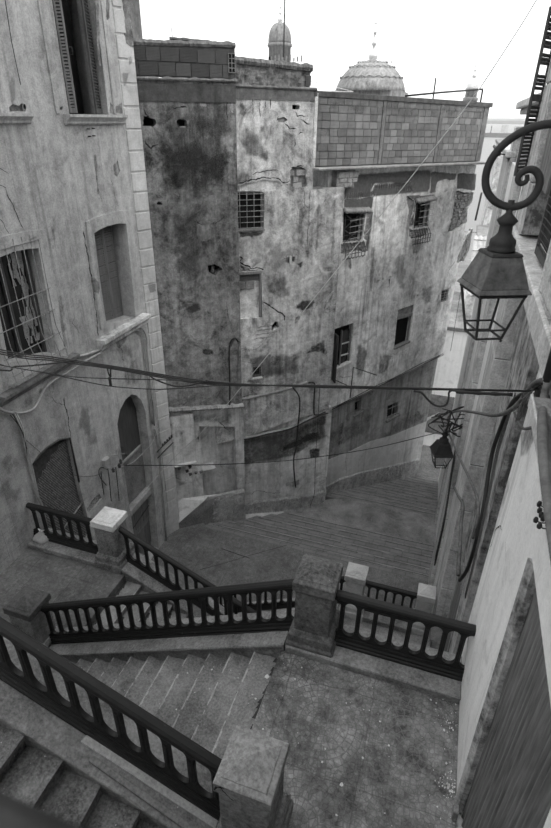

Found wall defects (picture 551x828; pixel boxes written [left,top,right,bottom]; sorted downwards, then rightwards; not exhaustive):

spalling [290,167,308,189]